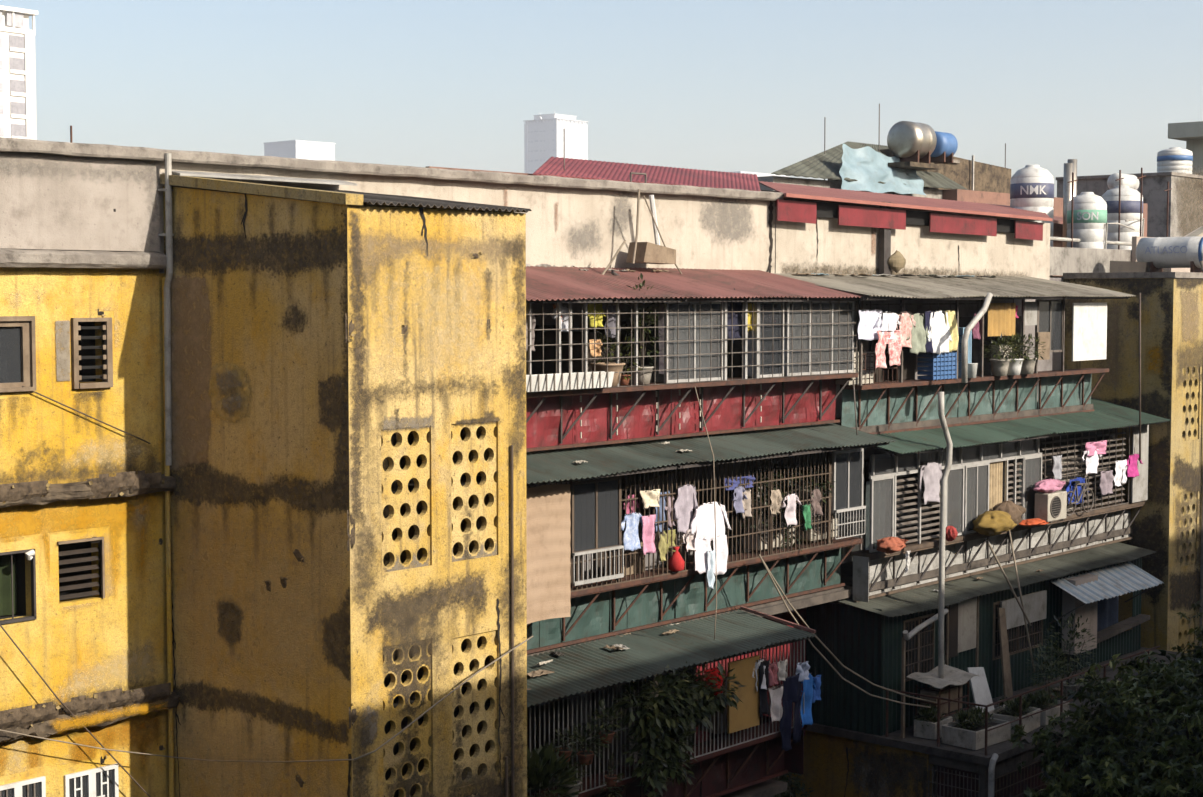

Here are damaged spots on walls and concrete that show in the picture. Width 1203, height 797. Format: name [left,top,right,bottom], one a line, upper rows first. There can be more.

crack [240,193,248,238]
crack [419,207,428,257]
damp [571,223,597,253]
damp [703,198,752,240]
damp [1063,279,1203,419]
damp [0,211,527,797]